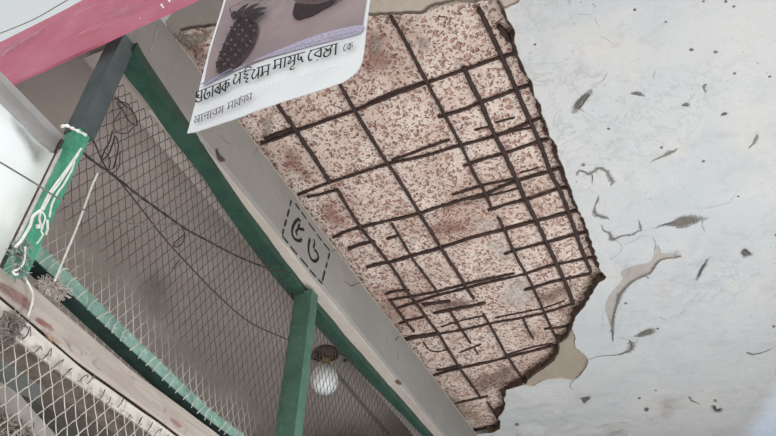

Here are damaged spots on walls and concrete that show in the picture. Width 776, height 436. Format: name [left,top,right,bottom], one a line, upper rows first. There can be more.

spalling [238,0,606,433]
peeling [605,245,680,326]